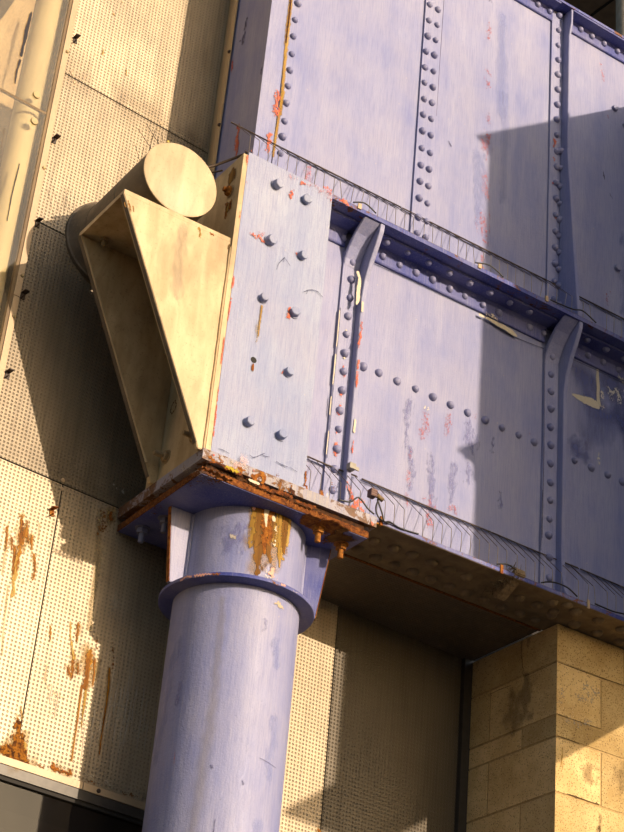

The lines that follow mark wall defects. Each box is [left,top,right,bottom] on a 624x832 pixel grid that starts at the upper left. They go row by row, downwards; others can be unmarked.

corrosion [179,456,355,576]